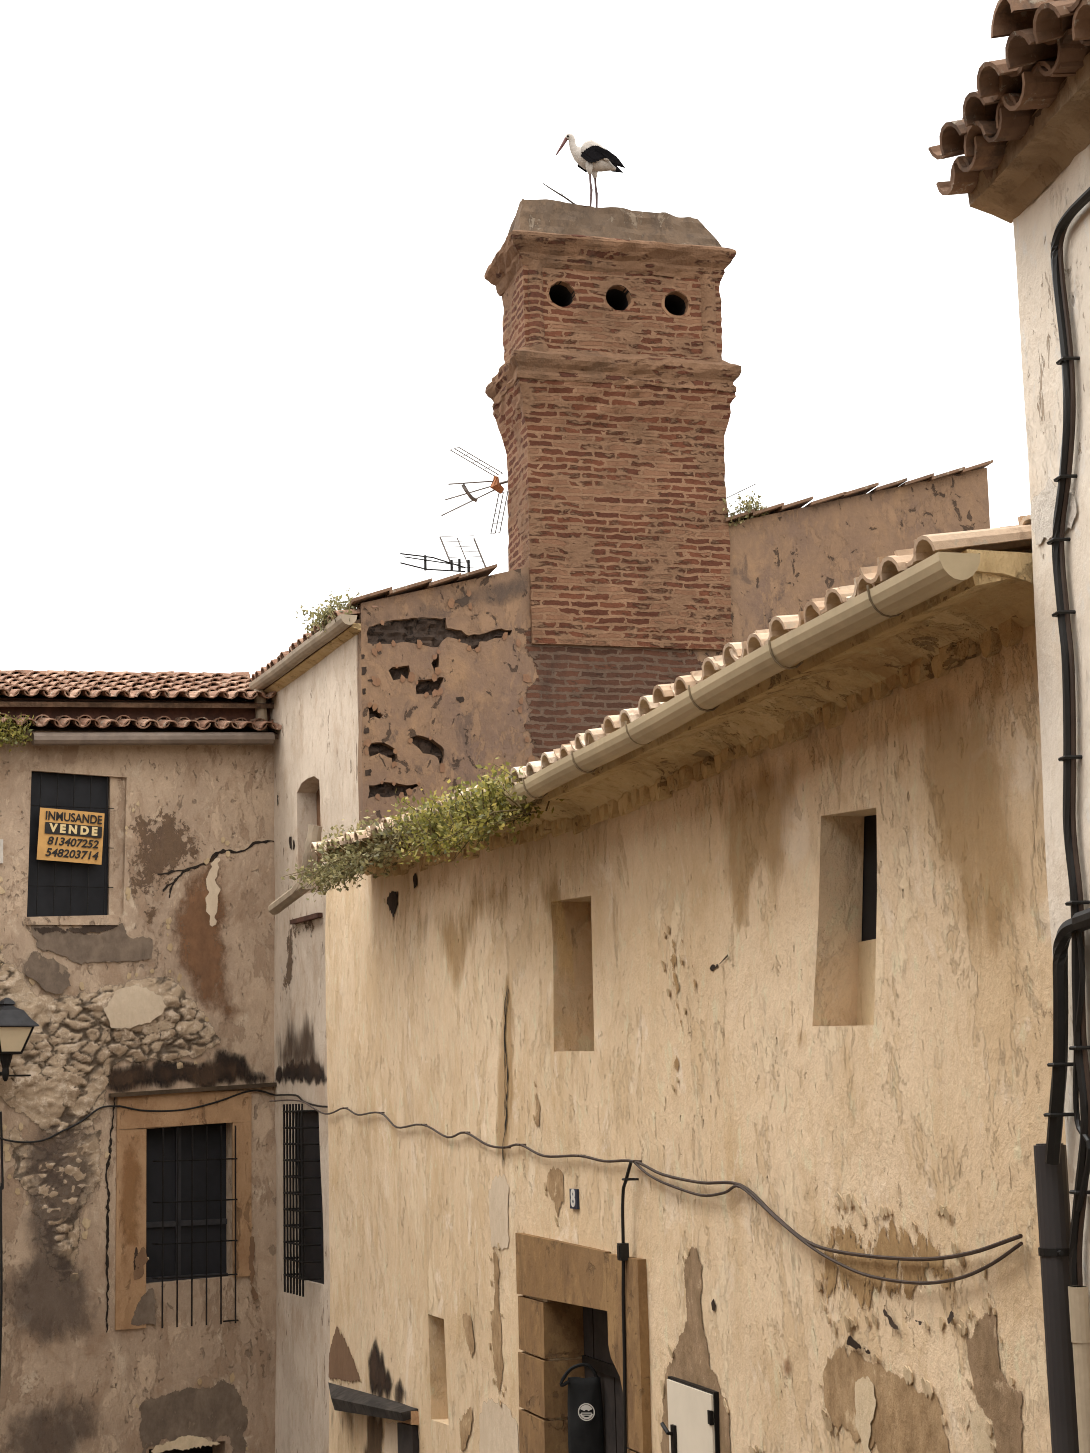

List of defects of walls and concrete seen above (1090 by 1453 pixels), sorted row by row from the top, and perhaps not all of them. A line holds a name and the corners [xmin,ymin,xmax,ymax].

flaking render [361,590,703,800]
crack [157,840,274,898]
spalling [0,801,233,1280]
leakage [107,1020,327,1092]
leakage [12,1125,90,1340]
spalling [135,1373,248,1453]
flaking render [329,1327,362,1385]
flaking render [660,1247,730,1453]
flaking render [815,1192,1024,1453]